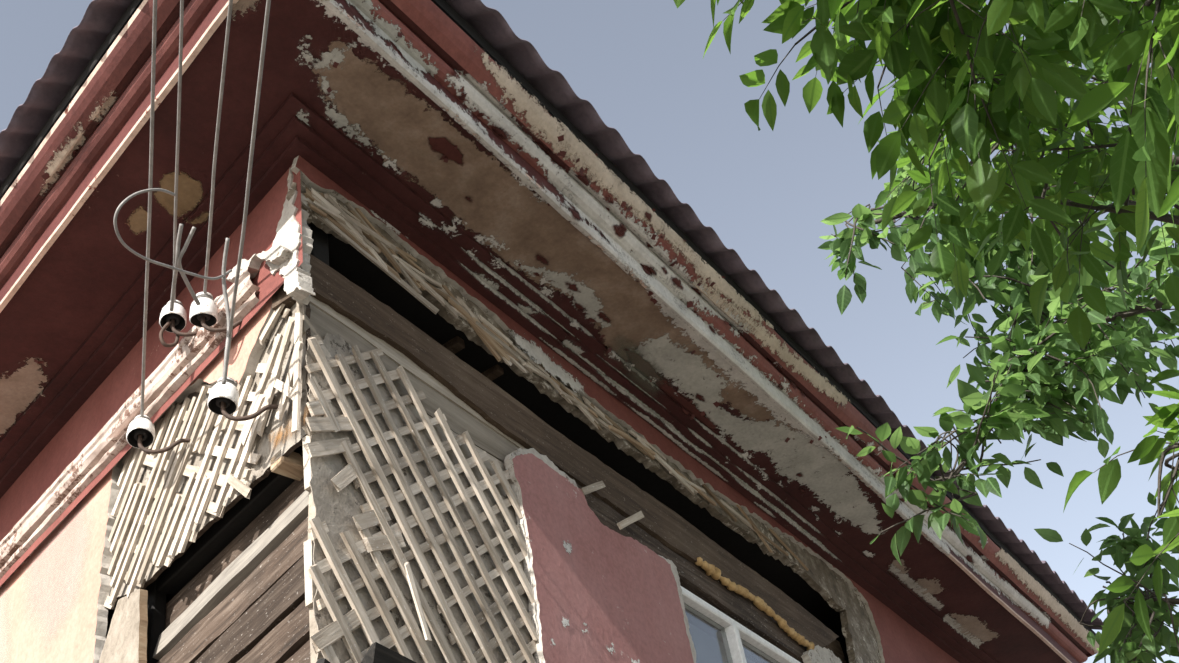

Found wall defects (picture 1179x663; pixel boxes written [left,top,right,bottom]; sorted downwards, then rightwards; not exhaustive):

peeling [232,0,259,21]
peeling [40,91,117,195]
peeling [127,206,148,235]
peeling [154,172,209,225]
peeling [295,0,1099,654]
peeling [0,357,48,437]
flaking render [103,302,556,663]